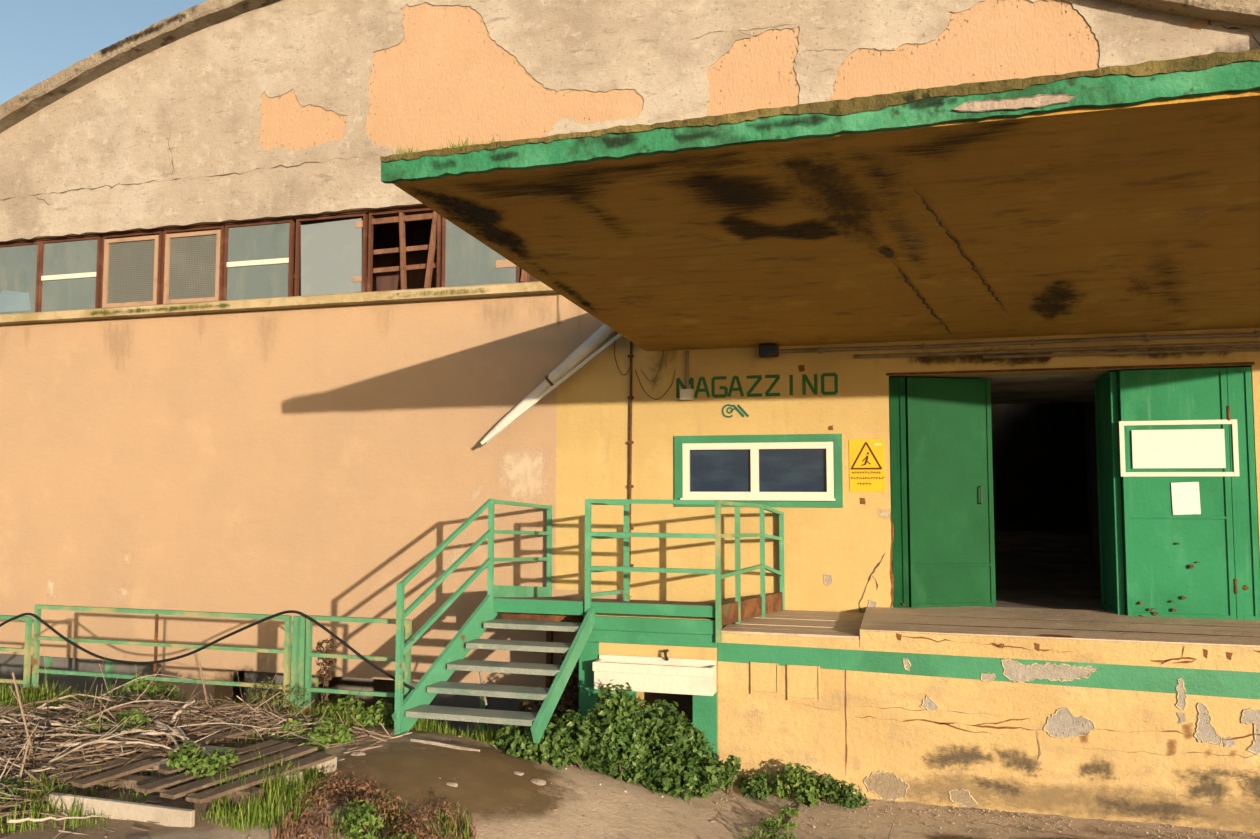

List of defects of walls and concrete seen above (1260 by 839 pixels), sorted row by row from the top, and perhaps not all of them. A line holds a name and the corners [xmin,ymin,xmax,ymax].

peeling [365,2,644,152]
peeling [706,27,800,116]
peeling [829,0,1100,101]
crack [2,133,362,208]
water stain [604,134,634,146]
water stain [414,152,883,257]
water stain [749,116,825,129]
crack [908,183,1008,313]
peeling [980,634,1098,684]
crack [790,670,1043,763]
peeling [1175,678,1260,755]
water stain [913,777,1260,831]